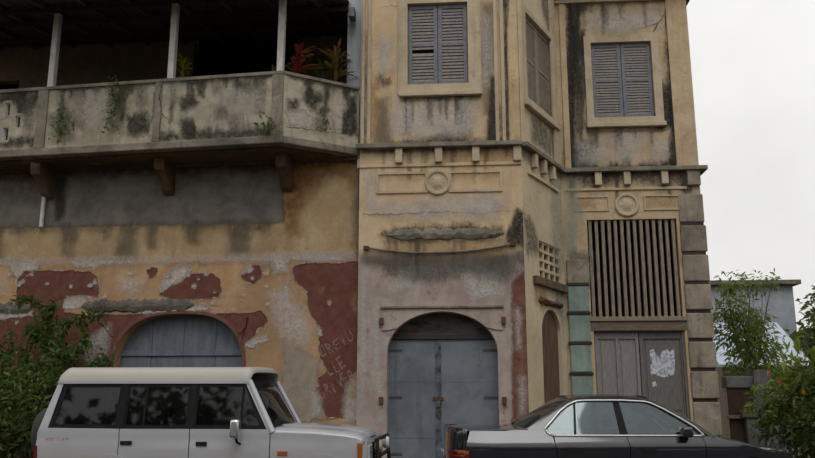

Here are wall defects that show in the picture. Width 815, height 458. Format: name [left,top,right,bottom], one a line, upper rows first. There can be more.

leakage [0,92,39,147]
leakage [50,84,155,139]
leakage [159,76,271,141]
leakage [376,100,389,143]
leakage [400,0,509,143]
leakage [523,4,692,194]
peeling [0,251,380,458]